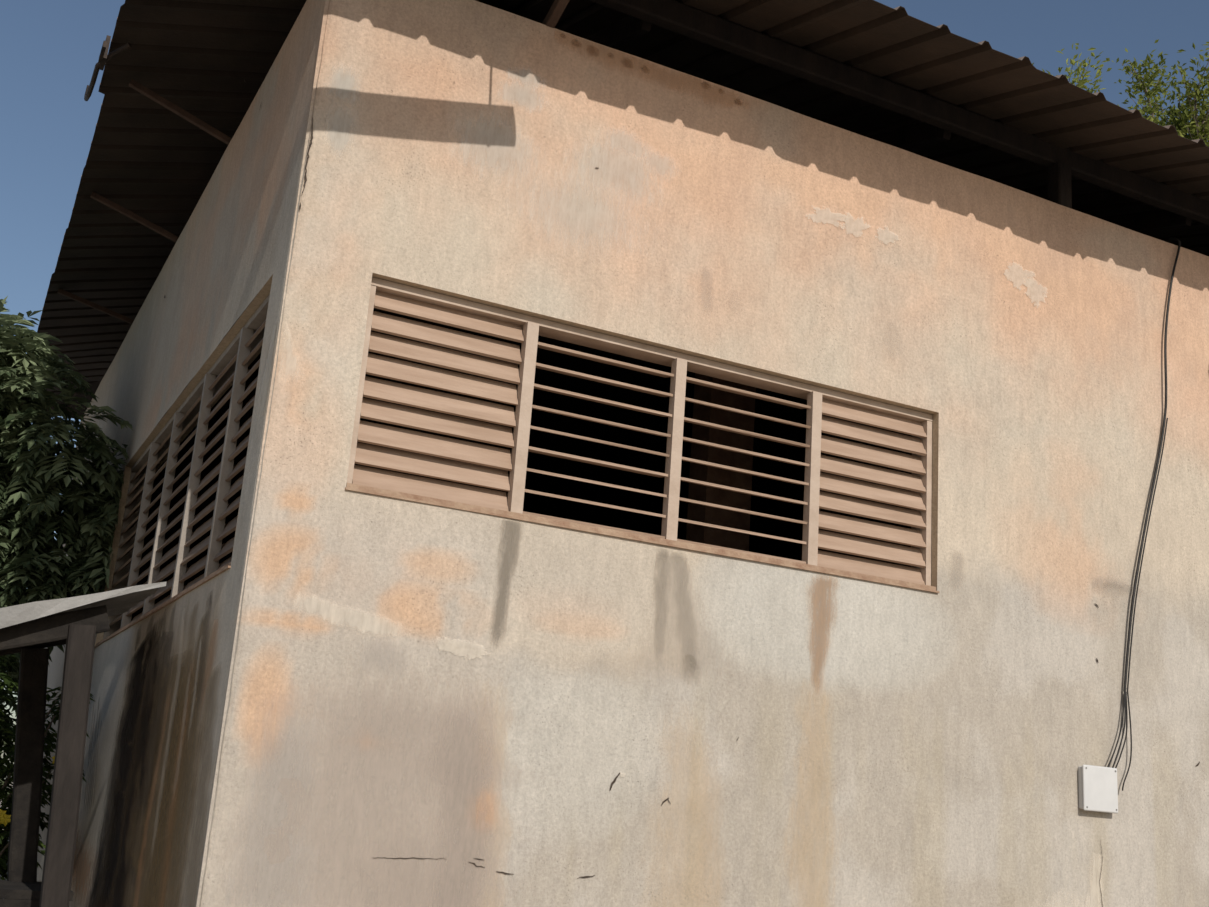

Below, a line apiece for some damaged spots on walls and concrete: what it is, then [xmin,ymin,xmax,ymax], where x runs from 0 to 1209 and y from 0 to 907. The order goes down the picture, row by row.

crack [300,117,313,208]
peeling [1004,262,1048,306]
water stain [493,521,520,642]
water stain [656,553,696,673]
water stain [84,614,218,907]